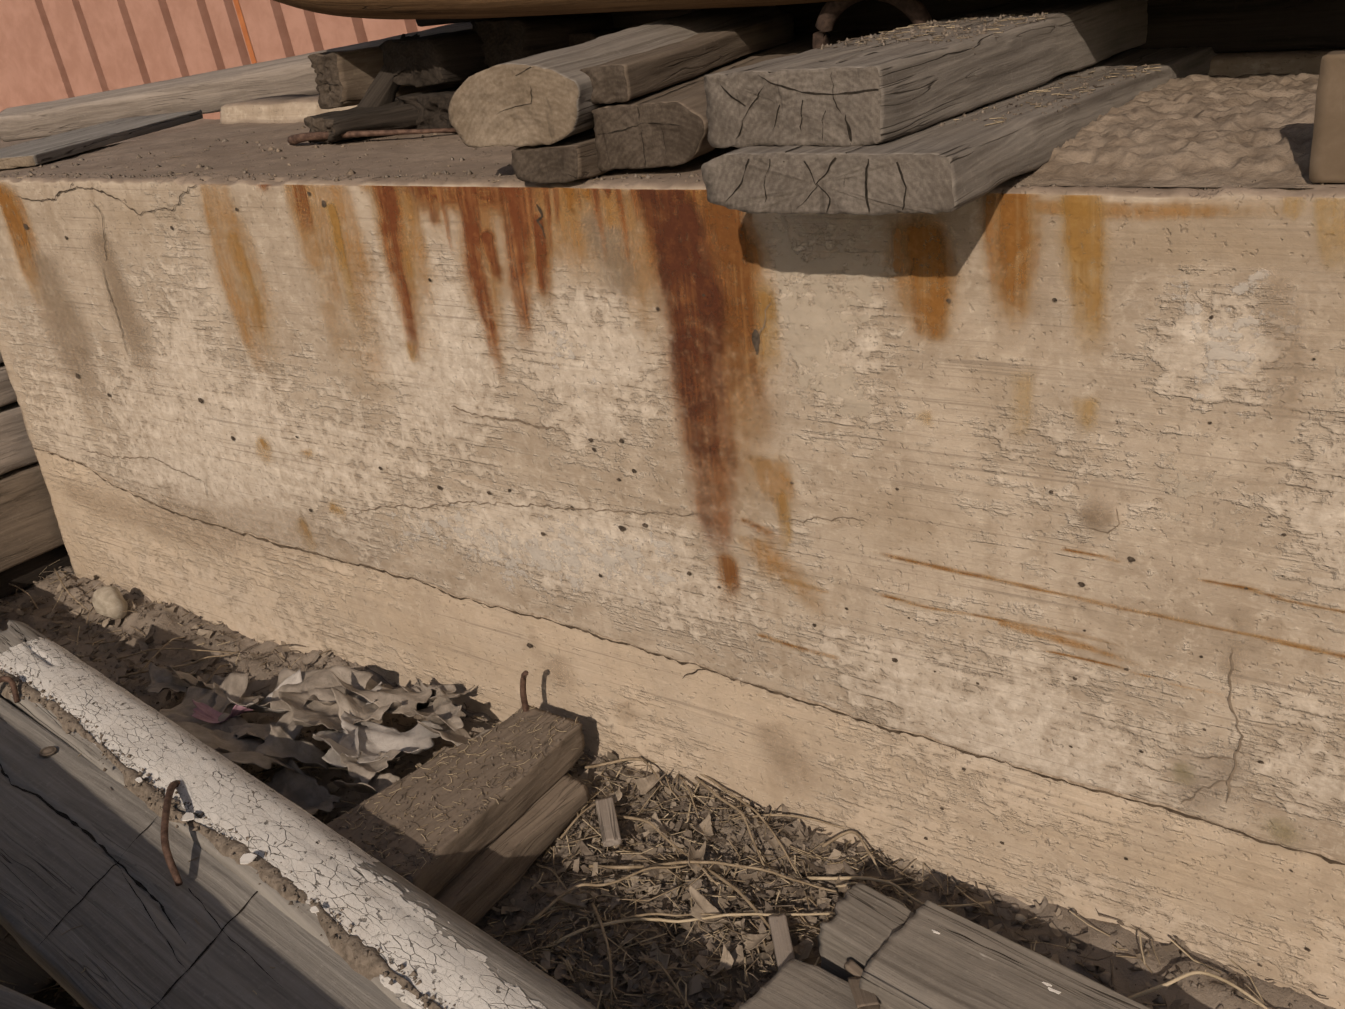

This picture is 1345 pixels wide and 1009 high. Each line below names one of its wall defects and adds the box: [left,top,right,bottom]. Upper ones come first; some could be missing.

corrosion [0,185,37,277]
corrosion [202,188,257,346]
corrosion [891,221,954,338]
corrosion [983,193,1227,329]
corrosion [359,185,808,591]
crack [33,447,1345,865]
corrosion [974,615,1117,667]